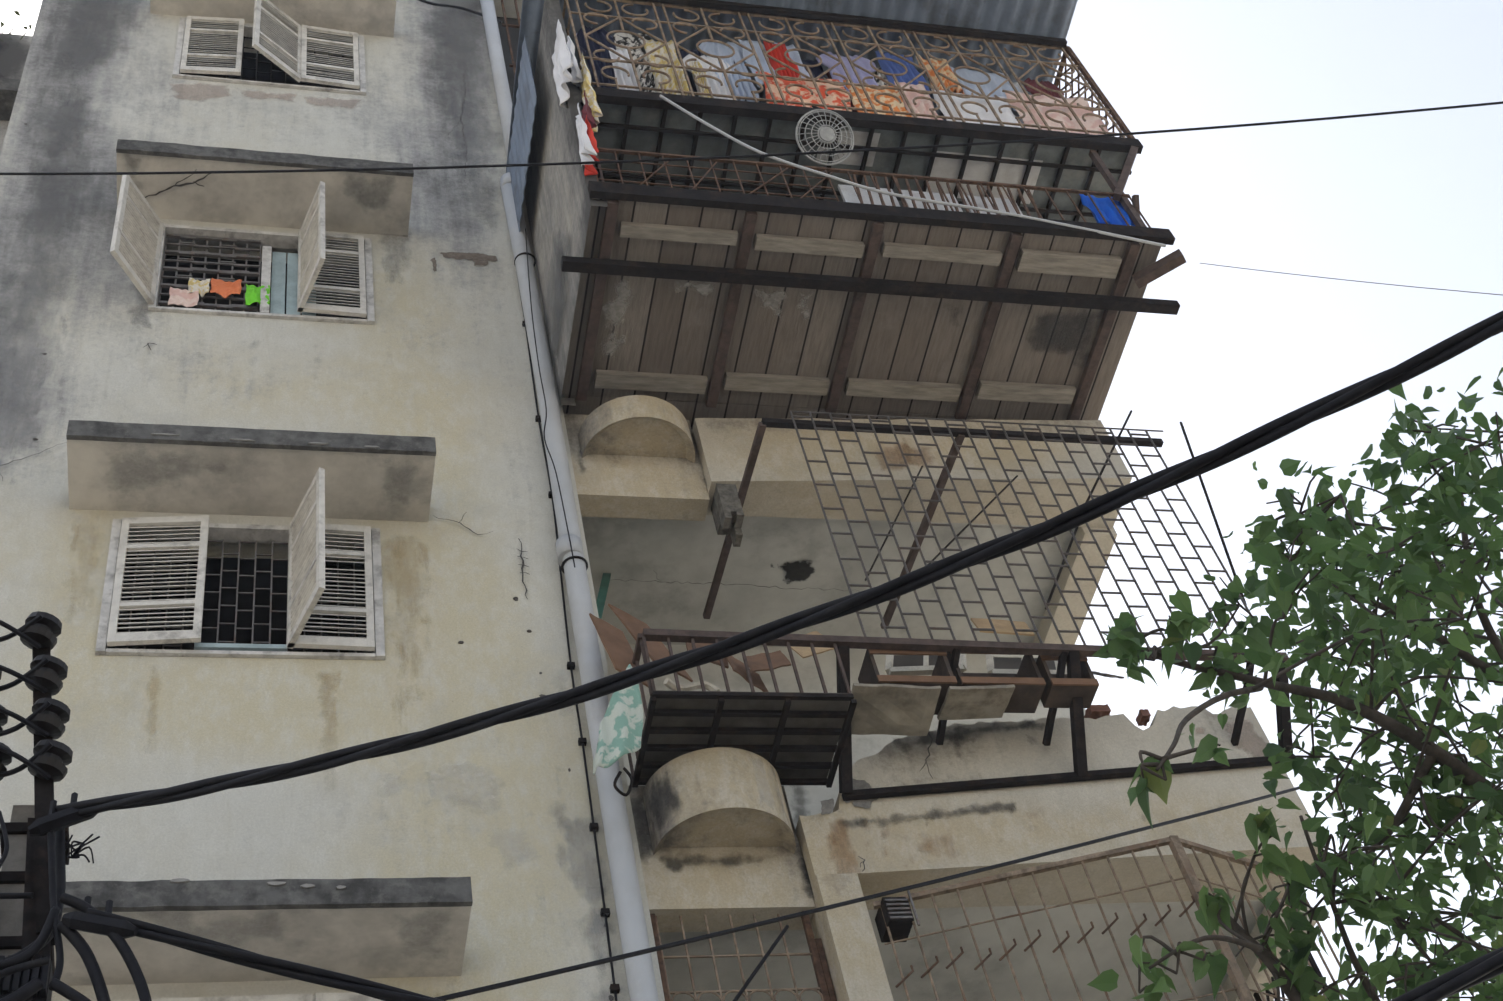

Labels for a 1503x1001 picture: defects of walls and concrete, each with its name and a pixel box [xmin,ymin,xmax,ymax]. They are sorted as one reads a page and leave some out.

crack [433,515,530,599]
leakage [771,560,815,584]
leakage [632,782,678,855]
leakage [785,787,805,829]
leakage [929,803,1014,817]
leakage [666,856,739,870]
leakage [801,854,814,896]